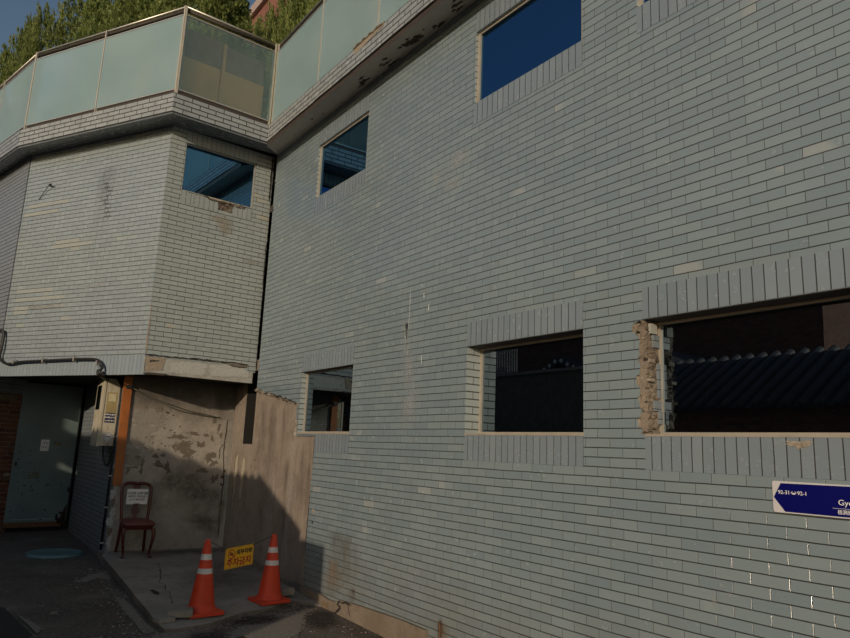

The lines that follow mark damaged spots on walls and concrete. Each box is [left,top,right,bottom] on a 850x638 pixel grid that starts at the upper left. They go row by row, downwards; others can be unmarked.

spalling [353,21,385,54]
peeling [379,20,446,67]
peeling [113,407,225,486]
peeling [106,486,119,549]